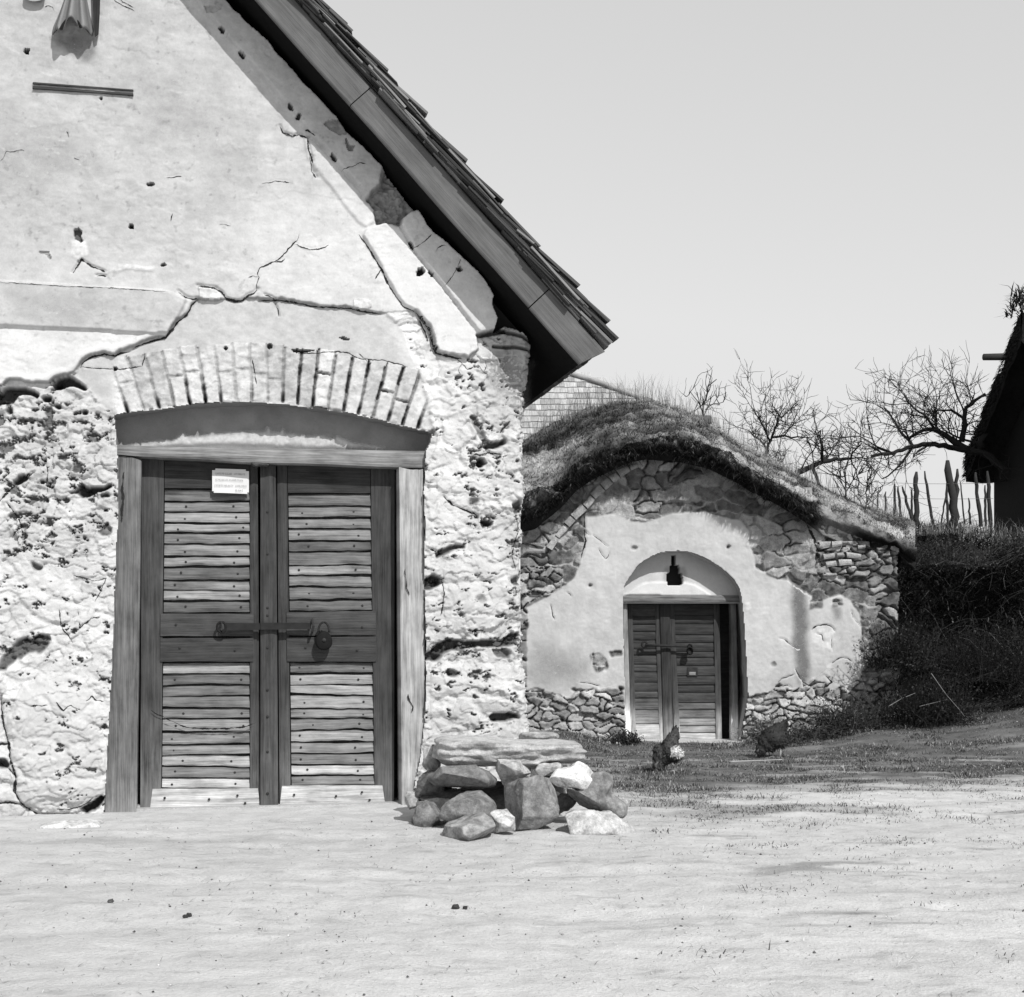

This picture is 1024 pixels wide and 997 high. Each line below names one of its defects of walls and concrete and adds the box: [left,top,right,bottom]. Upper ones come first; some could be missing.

crack [267,127,316,183]
spalling [367,175,413,227]
crack [2,235,487,375]
spalling [0,287,900,816]